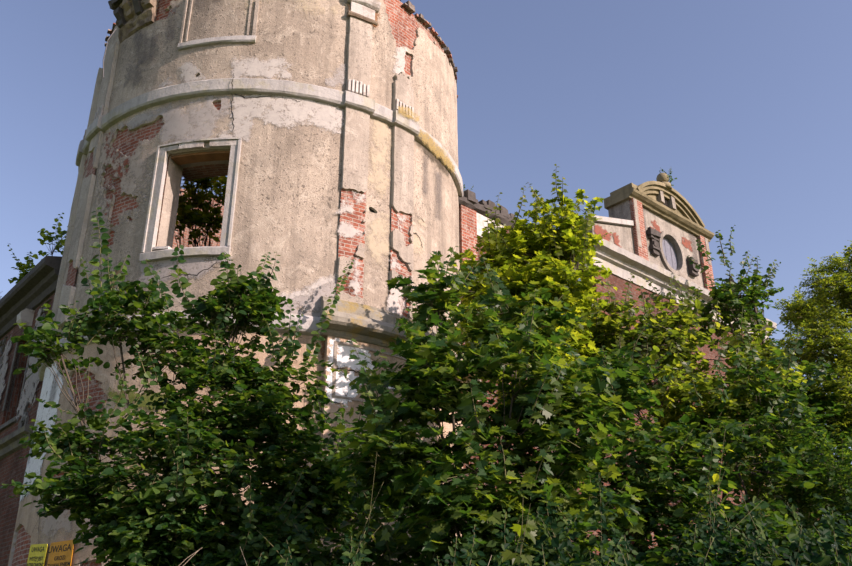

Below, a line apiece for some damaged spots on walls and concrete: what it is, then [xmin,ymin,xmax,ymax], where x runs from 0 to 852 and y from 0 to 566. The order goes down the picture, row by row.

spalling [150,0,177,24]
spalling [383,0,418,76]
crack [231,74,269,135]
peeling [83,94,345,247]
spalling [271,119,426,318]
peeling [0,339,12,399]
peeling [16,309,108,434]
peeling [20,442,72,538]